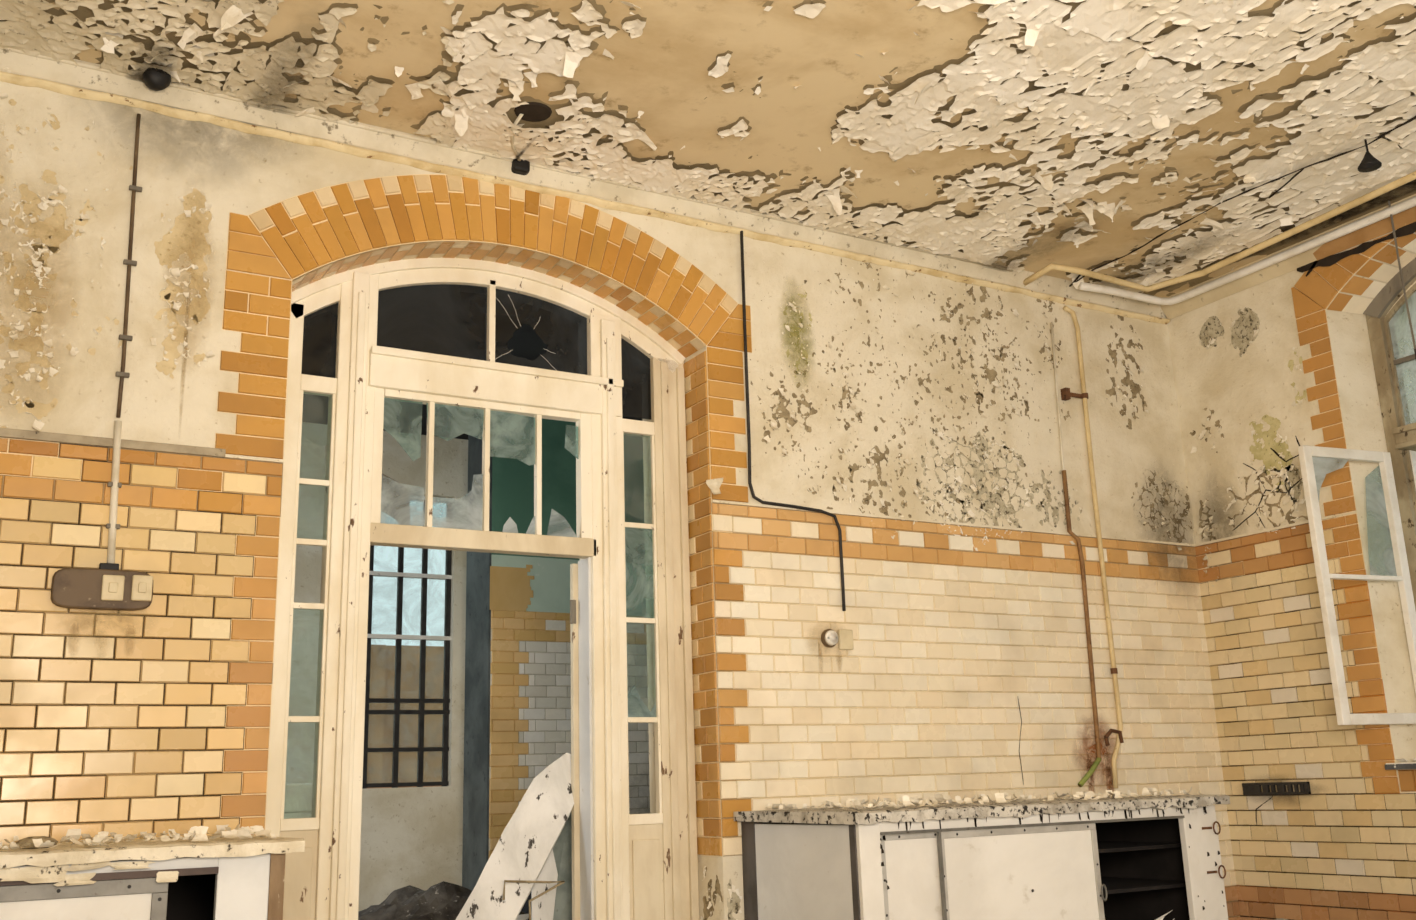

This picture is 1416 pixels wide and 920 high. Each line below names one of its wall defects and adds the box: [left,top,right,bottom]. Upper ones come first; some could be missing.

leakage [19,264,49,300]
peeling [0,0,1416,551]
leakage [787,308,807,364]
rust [1083,729,1113,792]